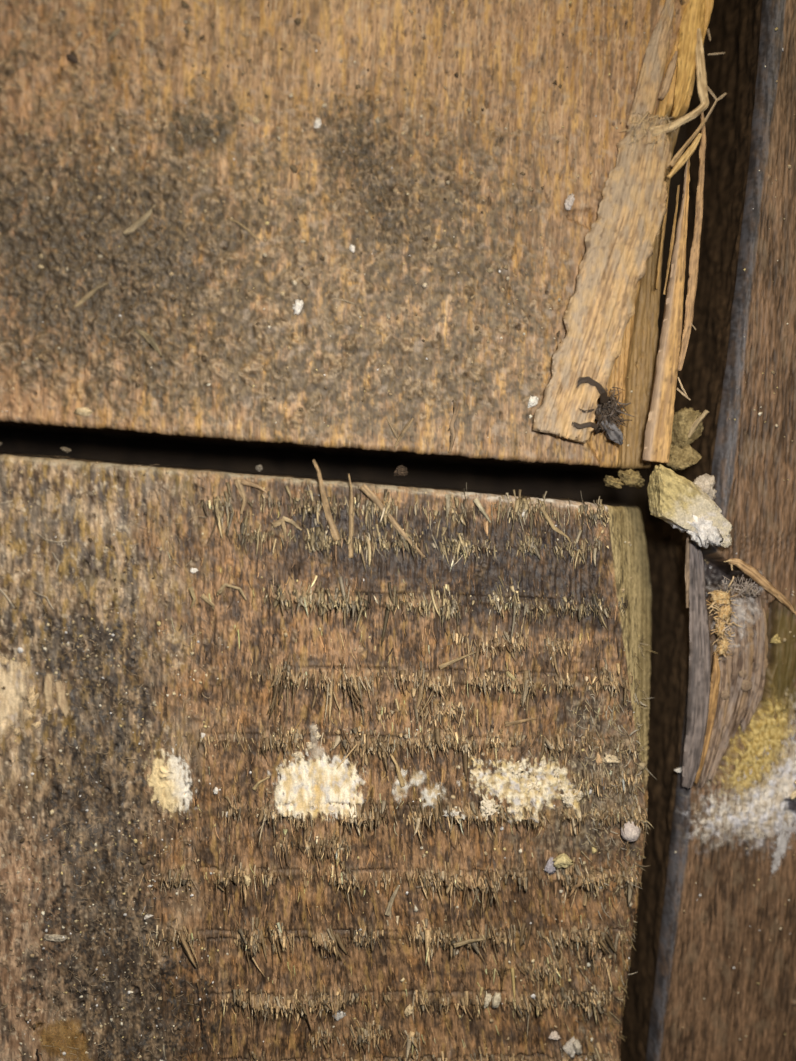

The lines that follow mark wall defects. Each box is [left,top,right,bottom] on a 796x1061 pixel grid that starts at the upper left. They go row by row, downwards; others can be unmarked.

damp [161,99,229,146]
damp [309,86,417,268]
damp [0,132,237,408]
damp [707,583,760,647]
damp [0,600,237,1061]
damp [266,724,365,821]
damp [392,753,587,824]
damp [696,699,796,873]